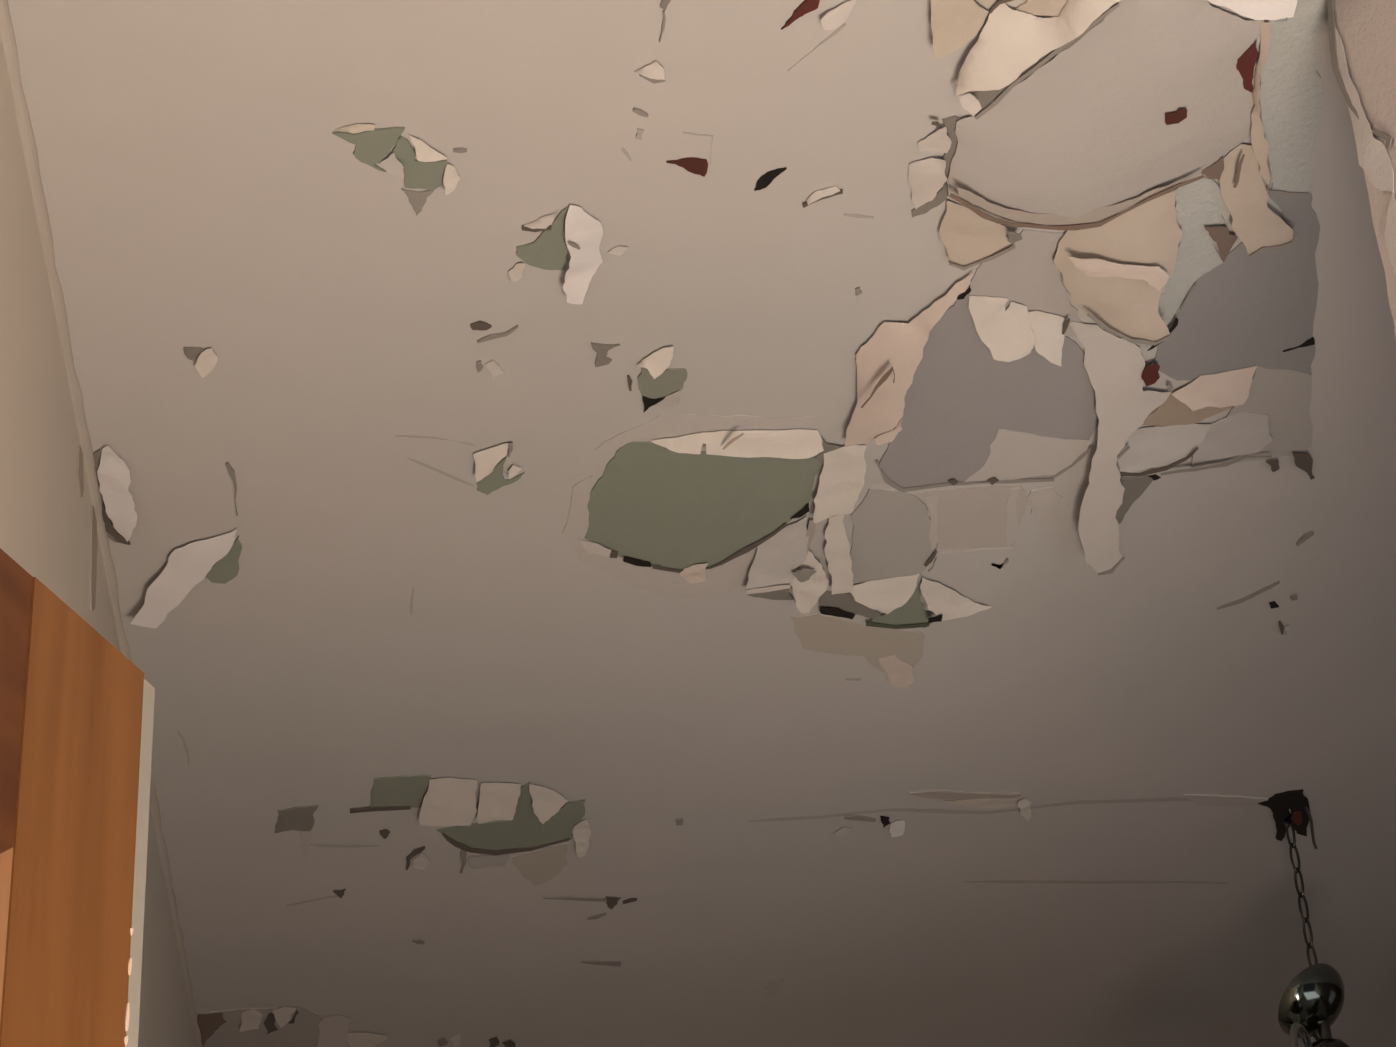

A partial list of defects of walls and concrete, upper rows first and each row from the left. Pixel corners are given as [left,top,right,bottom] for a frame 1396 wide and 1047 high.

flaking render [332,124,461,195]
peeling [508,205,629,304]
flaking render [578,0,1396,623]
peeling [93,446,137,545]
peeling [130,528,242,628]
spalling [275,805,318,833]
flaking render [371,775,592,870]
peeling [880,815,905,837]
spalling [605,896,621,909]
spalling [197,1012,227,1046]